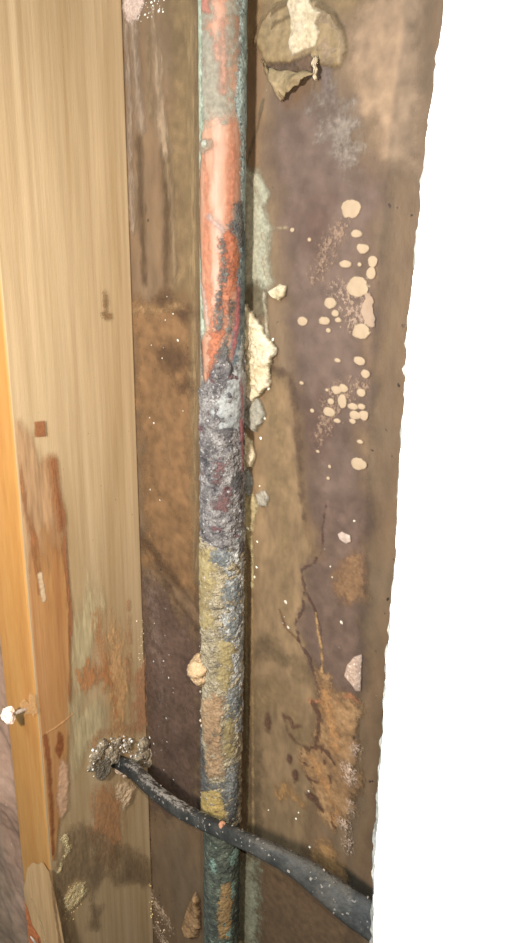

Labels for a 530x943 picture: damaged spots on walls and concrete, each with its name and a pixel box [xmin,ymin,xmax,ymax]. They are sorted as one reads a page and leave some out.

peeling [253,0,427,187]
peeling [308,200,377,339]
peeling [310,357,370,453]
peeling [351,458,367,470]
crack [282,505,343,697]
rust [75,619,148,749]
rust [282,671,365,833]